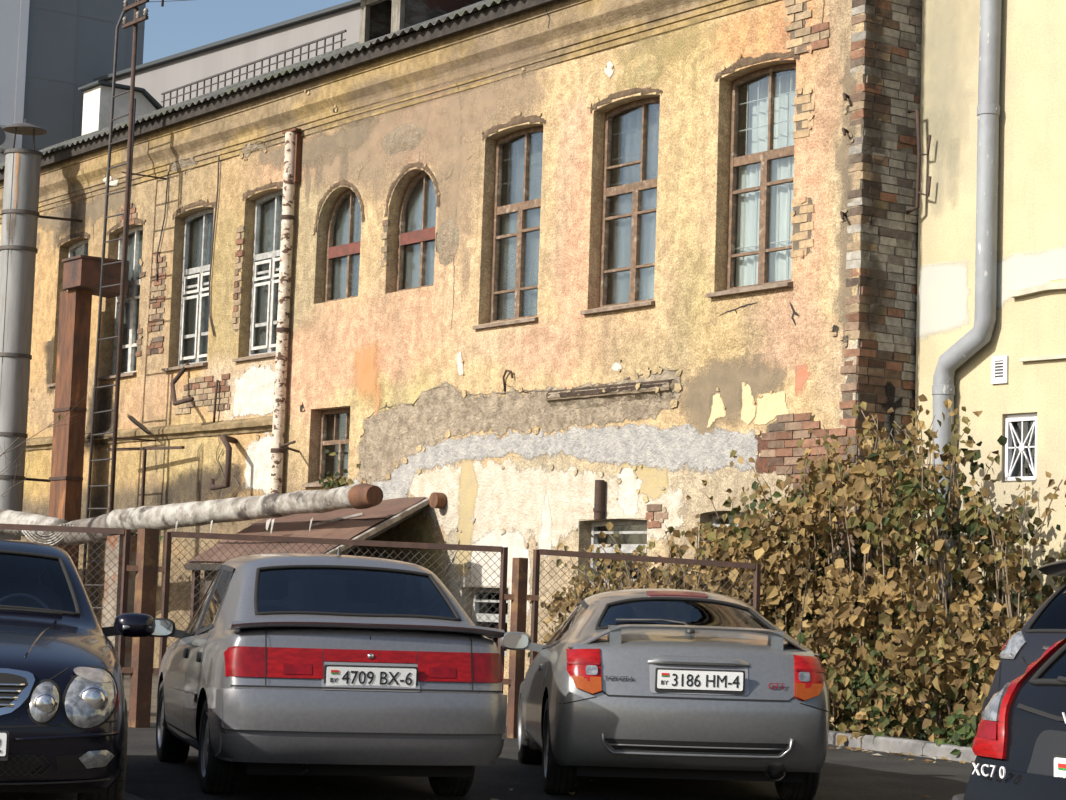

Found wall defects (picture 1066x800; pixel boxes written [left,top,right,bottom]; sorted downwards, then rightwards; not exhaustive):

flaking render [784,0,830,54]
flaking render [793,85,815,139]
flaking render [790,196,815,258]
flaking render [135,252,167,357]
peeling [174,364,275,419]
peeling [244,432,272,495]
spalling [351,351,859,616]